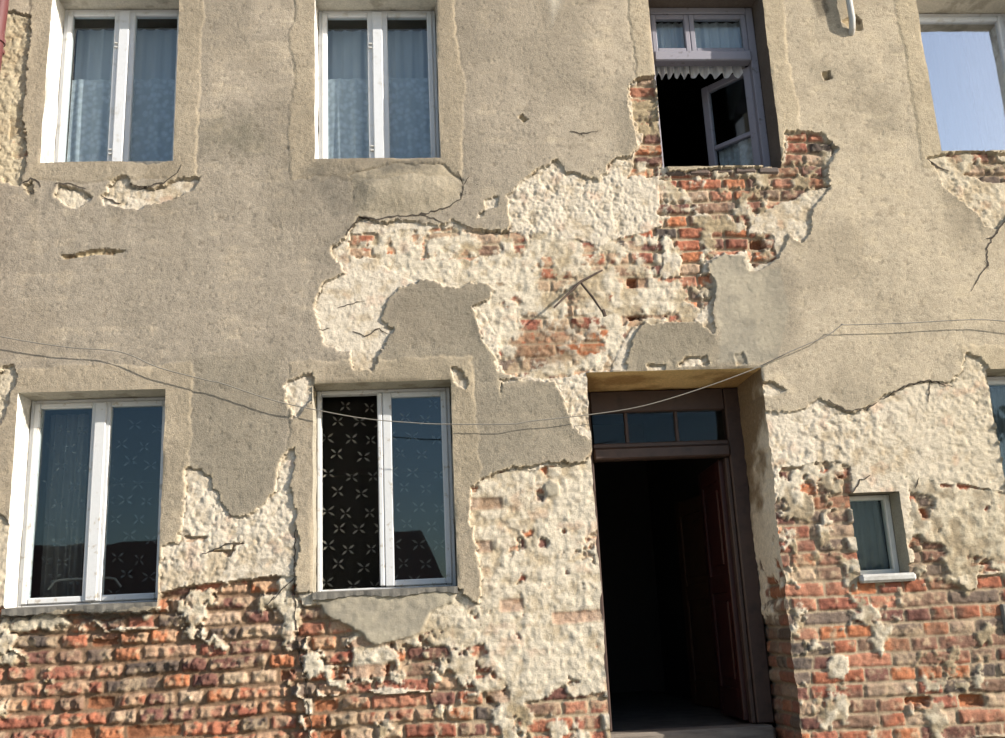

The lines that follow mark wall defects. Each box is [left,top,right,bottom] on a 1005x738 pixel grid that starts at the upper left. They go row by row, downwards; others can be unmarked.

flaking render [0,10,34,194]
flaking render [55,174,200,210]
flaking render [928,150,1005,229]
flaking render [61,247,126,260]
flaking render [315,75,839,439]
crack [971,221,1005,291]
flaking render [285,373,315,418]
crack [828,379,952,411]
crack [202,543,245,554]
flaking render [765,352,1005,738]
flaking render [0,448,611,738]
crack [267,530,312,738]